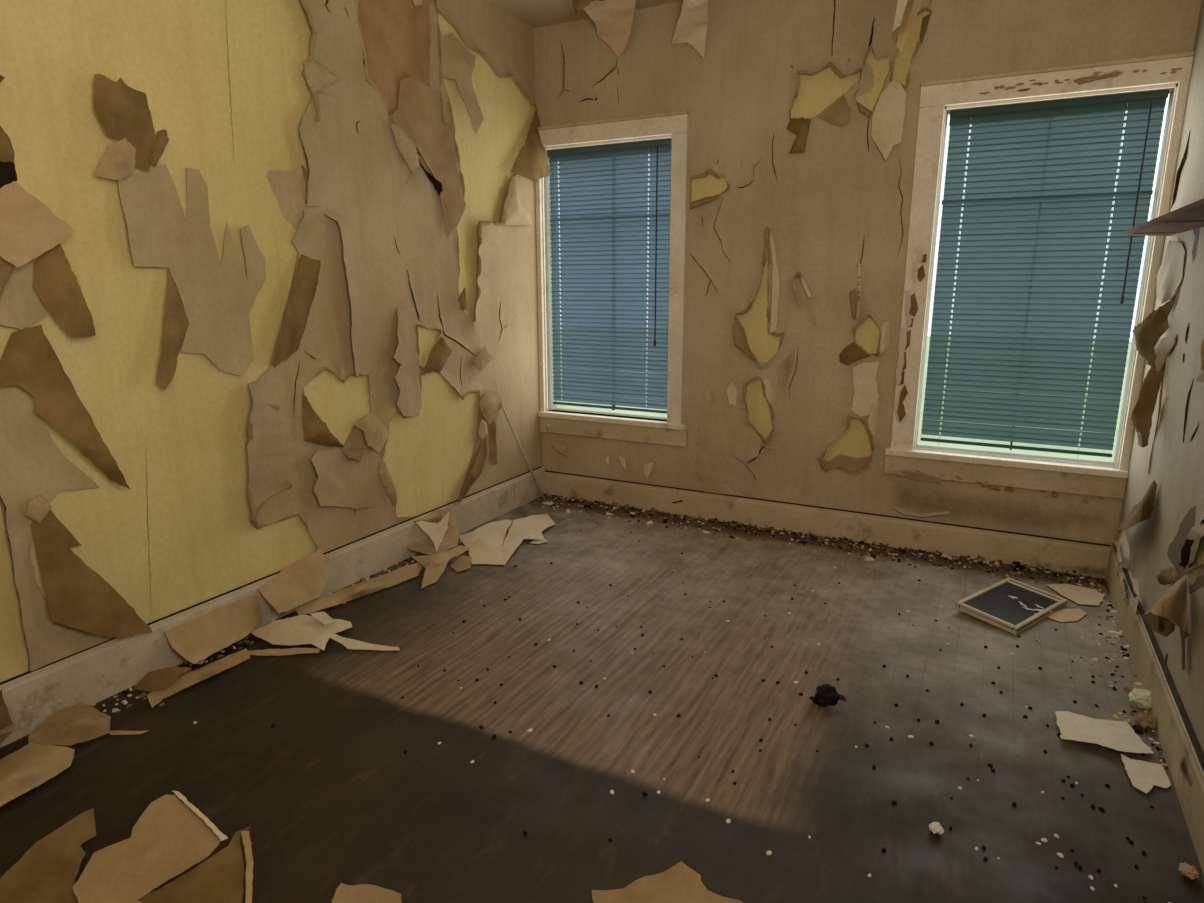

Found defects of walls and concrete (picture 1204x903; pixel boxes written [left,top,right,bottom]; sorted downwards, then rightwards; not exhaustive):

peeling [572,0,636,58]
peeling [671,0,708,59]
flaking render [785,0,938,160]
peeling [979,68,1182,94]
flaking render [688,157,761,210]
peeling [0,0,551,744]
flaking render [726,225,813,482]
flaking render [813,235,927,476]
peeling [1112,240,1204,670]